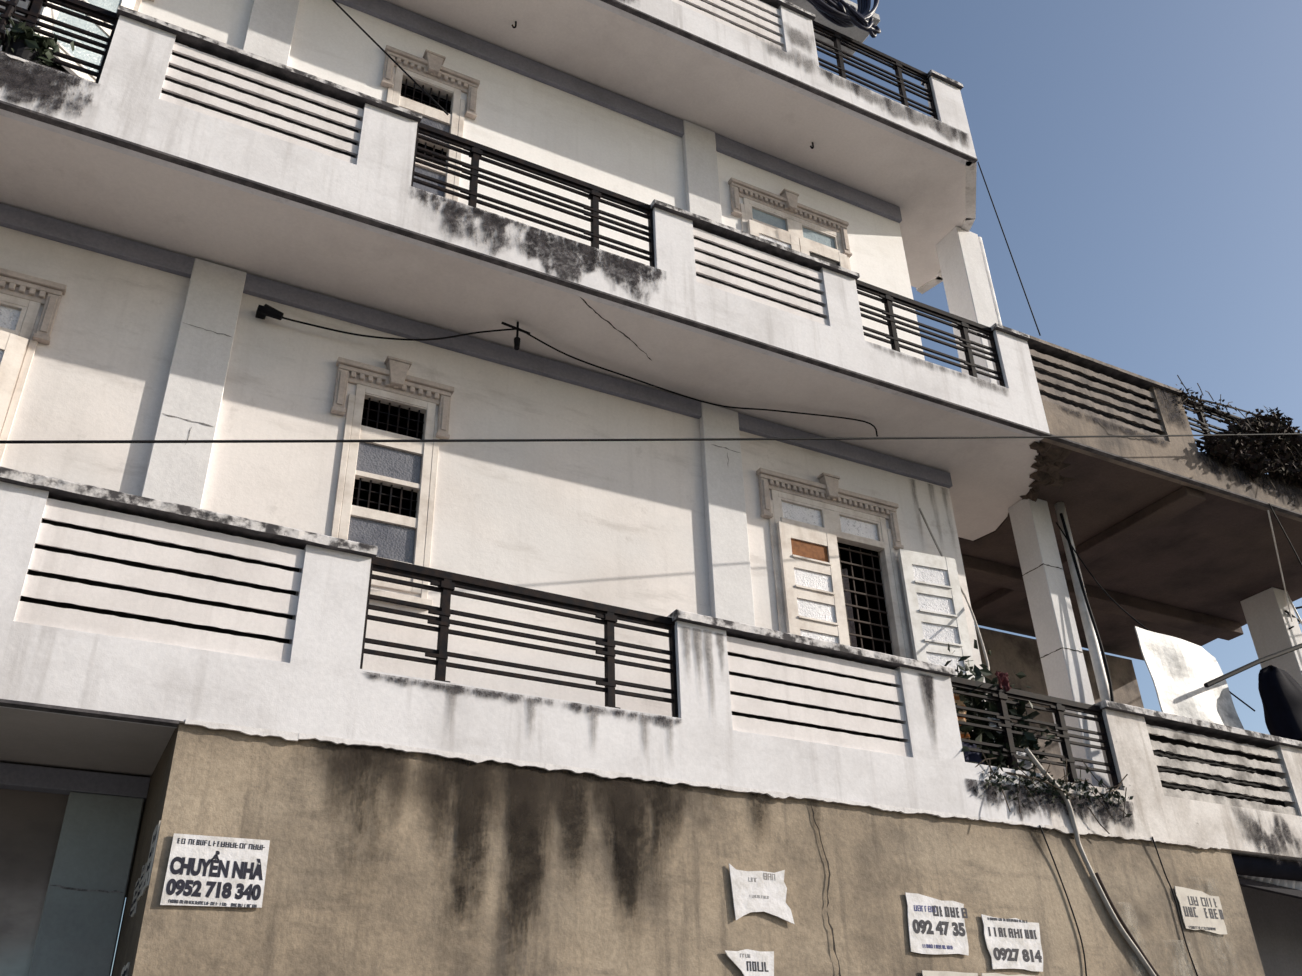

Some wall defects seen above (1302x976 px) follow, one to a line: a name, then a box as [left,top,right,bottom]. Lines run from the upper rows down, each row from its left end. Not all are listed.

water stain [0,50,95,115]
water stain [412,188,662,299]
water stain [367,672,553,718]
water stain [571,702,681,733]
water stain [333,744,407,806]
water stain [750,793,768,827]
water stain [966,779,1134,846]
water stain [425,755,686,963]
crack [810,803,841,976]